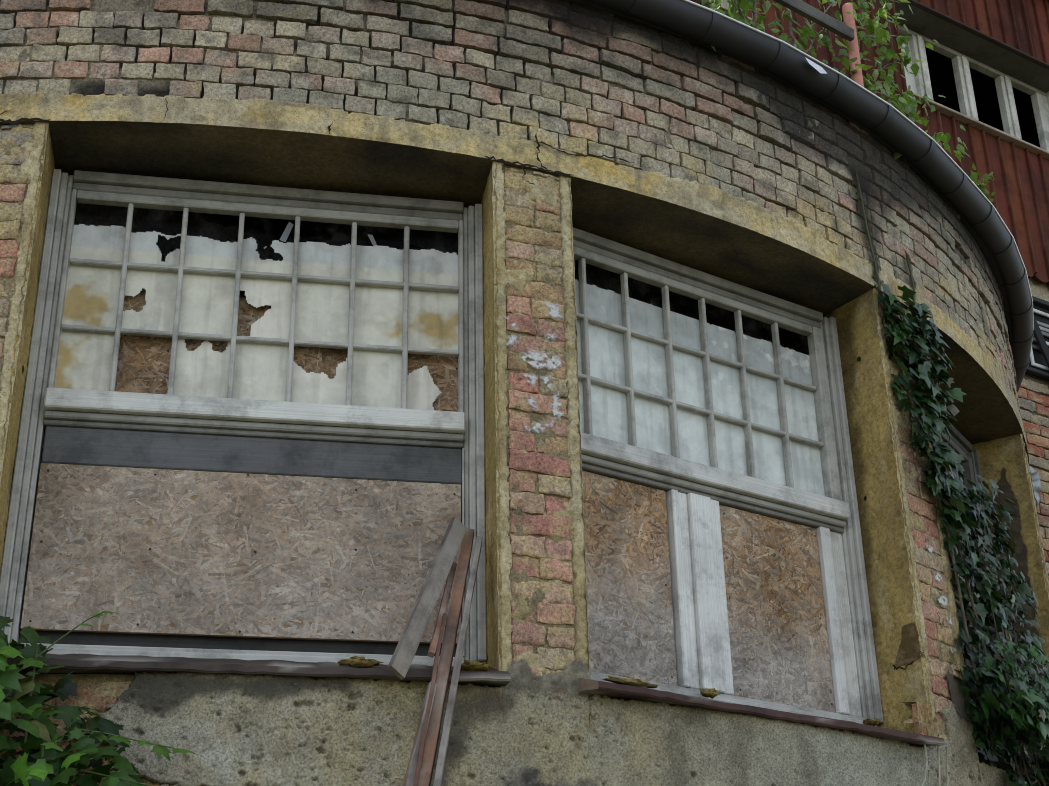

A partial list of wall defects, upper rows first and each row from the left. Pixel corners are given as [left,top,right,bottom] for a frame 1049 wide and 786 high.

crack [485,133,634,185]
flaking render [0,674,179,786]
water stain [430,688,513,786]
water stain [507,768,596,786]